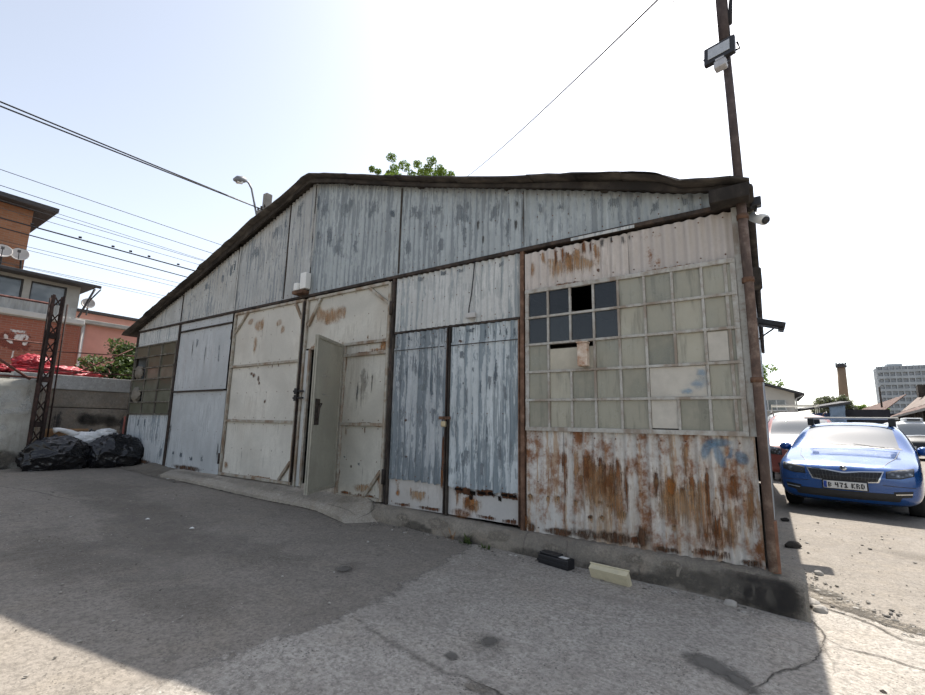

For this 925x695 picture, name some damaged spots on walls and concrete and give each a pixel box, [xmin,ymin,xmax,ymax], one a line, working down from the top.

rust [531,242,599,285]
peeling [4,329,29,358]
rust [395,491,438,512]
rust [455,493,516,524]
rust [527,431,766,570]